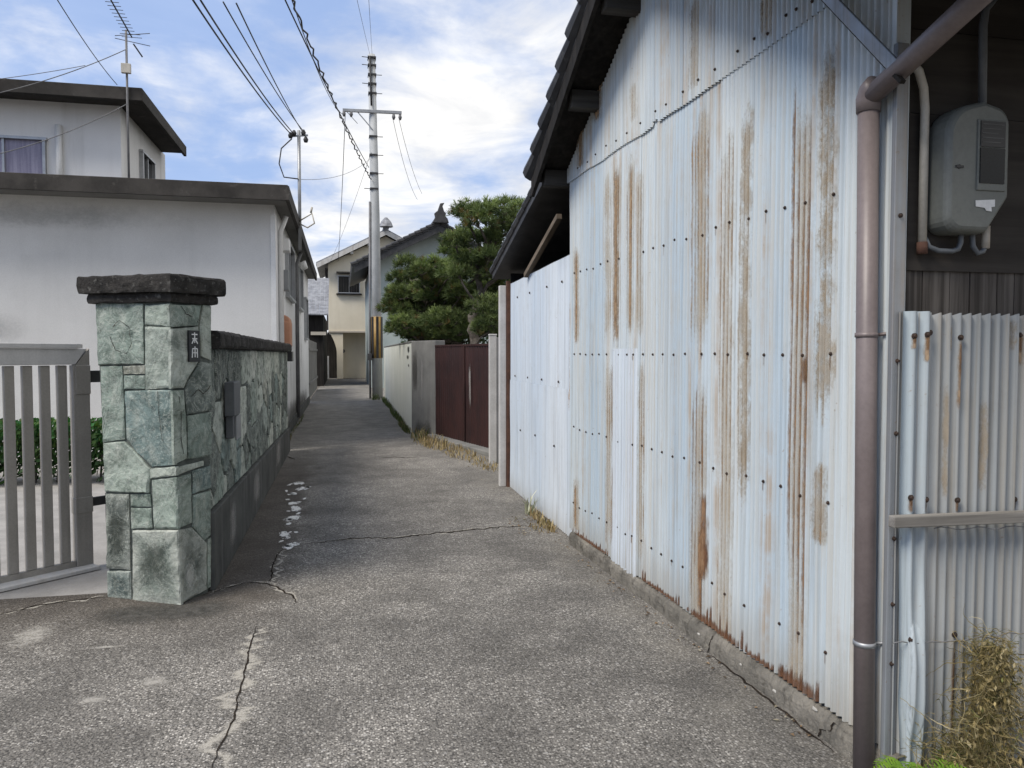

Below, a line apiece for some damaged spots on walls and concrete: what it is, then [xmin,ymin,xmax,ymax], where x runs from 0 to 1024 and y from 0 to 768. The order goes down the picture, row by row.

corrosion [607,173,642,339]
corrosion [642,103,822,703]
corrosion [913,336,930,361]
crack [204,525,518,602]
corrosion [574,488,608,555]
crack [199,626,270,768]
crack [706,636,843,751]